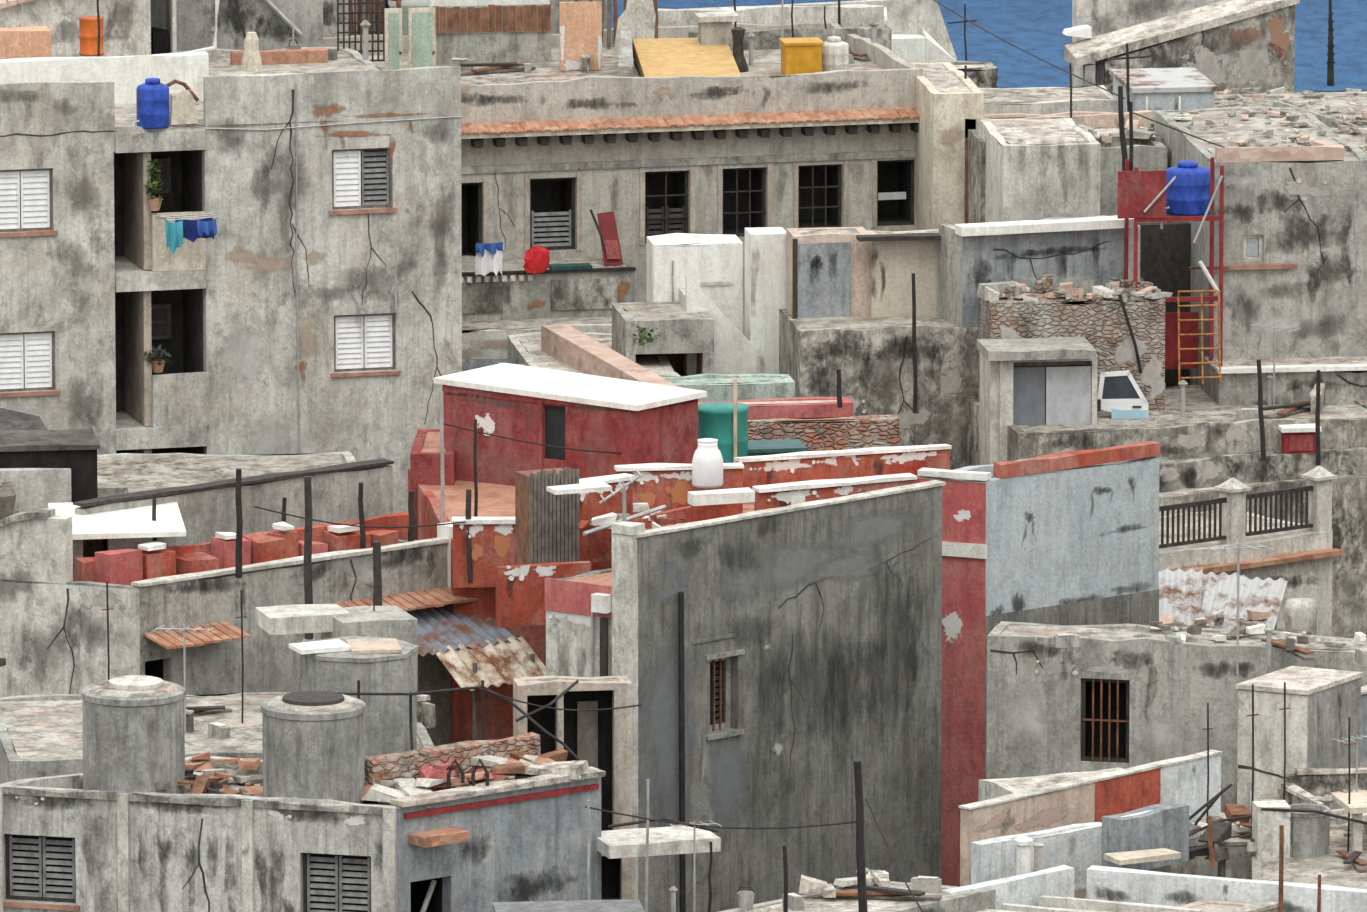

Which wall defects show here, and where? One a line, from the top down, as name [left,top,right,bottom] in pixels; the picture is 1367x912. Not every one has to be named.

flaking render [1180,13,1291,86]
leakage [1227,194,1352,293]
flaking render [475,413,495,436]
crack [182,818,210,912]